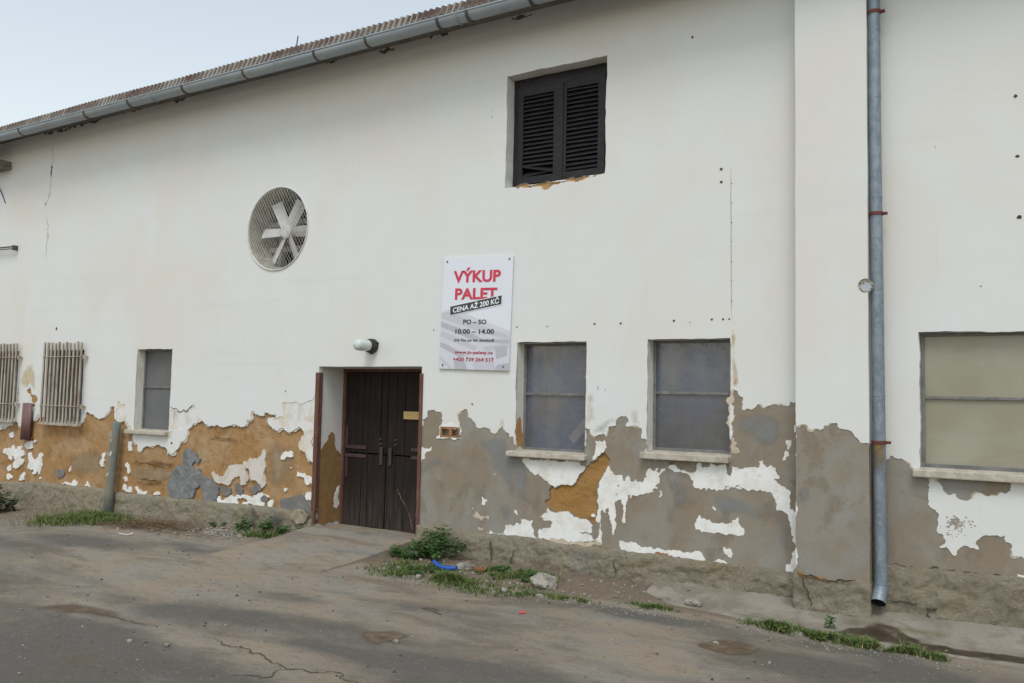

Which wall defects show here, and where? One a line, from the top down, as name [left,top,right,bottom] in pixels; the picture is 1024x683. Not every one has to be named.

flaking render [516,175,597,190]
flaking render [0,389,341,525]
peeling [419,389,874,583]
peeling [886,456,1024,578]